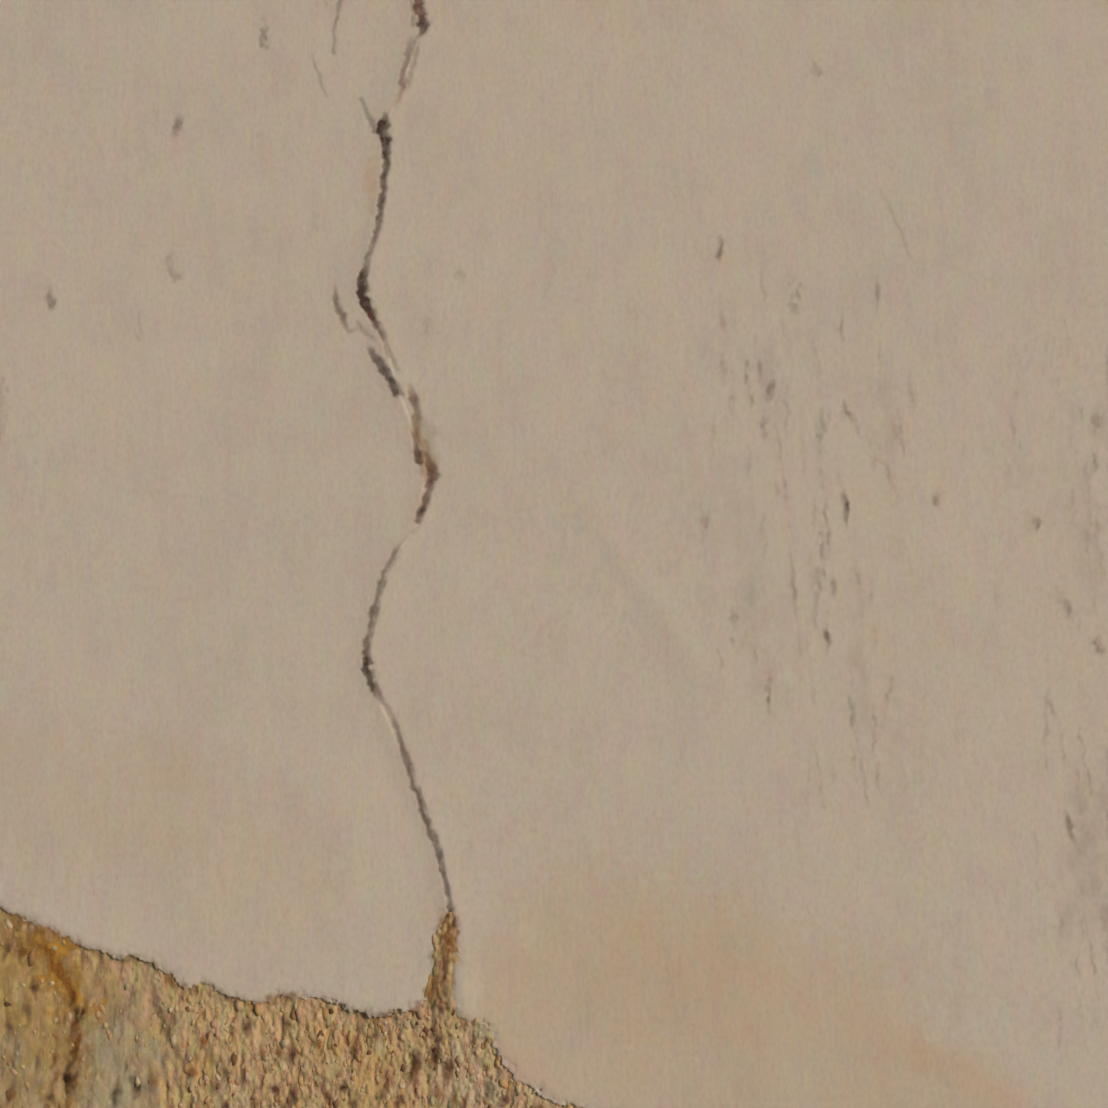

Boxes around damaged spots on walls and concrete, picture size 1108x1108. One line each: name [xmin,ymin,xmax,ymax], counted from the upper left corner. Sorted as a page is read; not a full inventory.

crack [414,0,428,34]
crack [374,119,391,238]
crack [356,269,378,328]
crack [373,358,416,402]
crack [415,451,437,517]
crack [362,646,376,692]
crack [401,745,454,923]
spalling [0,908,582,1108]